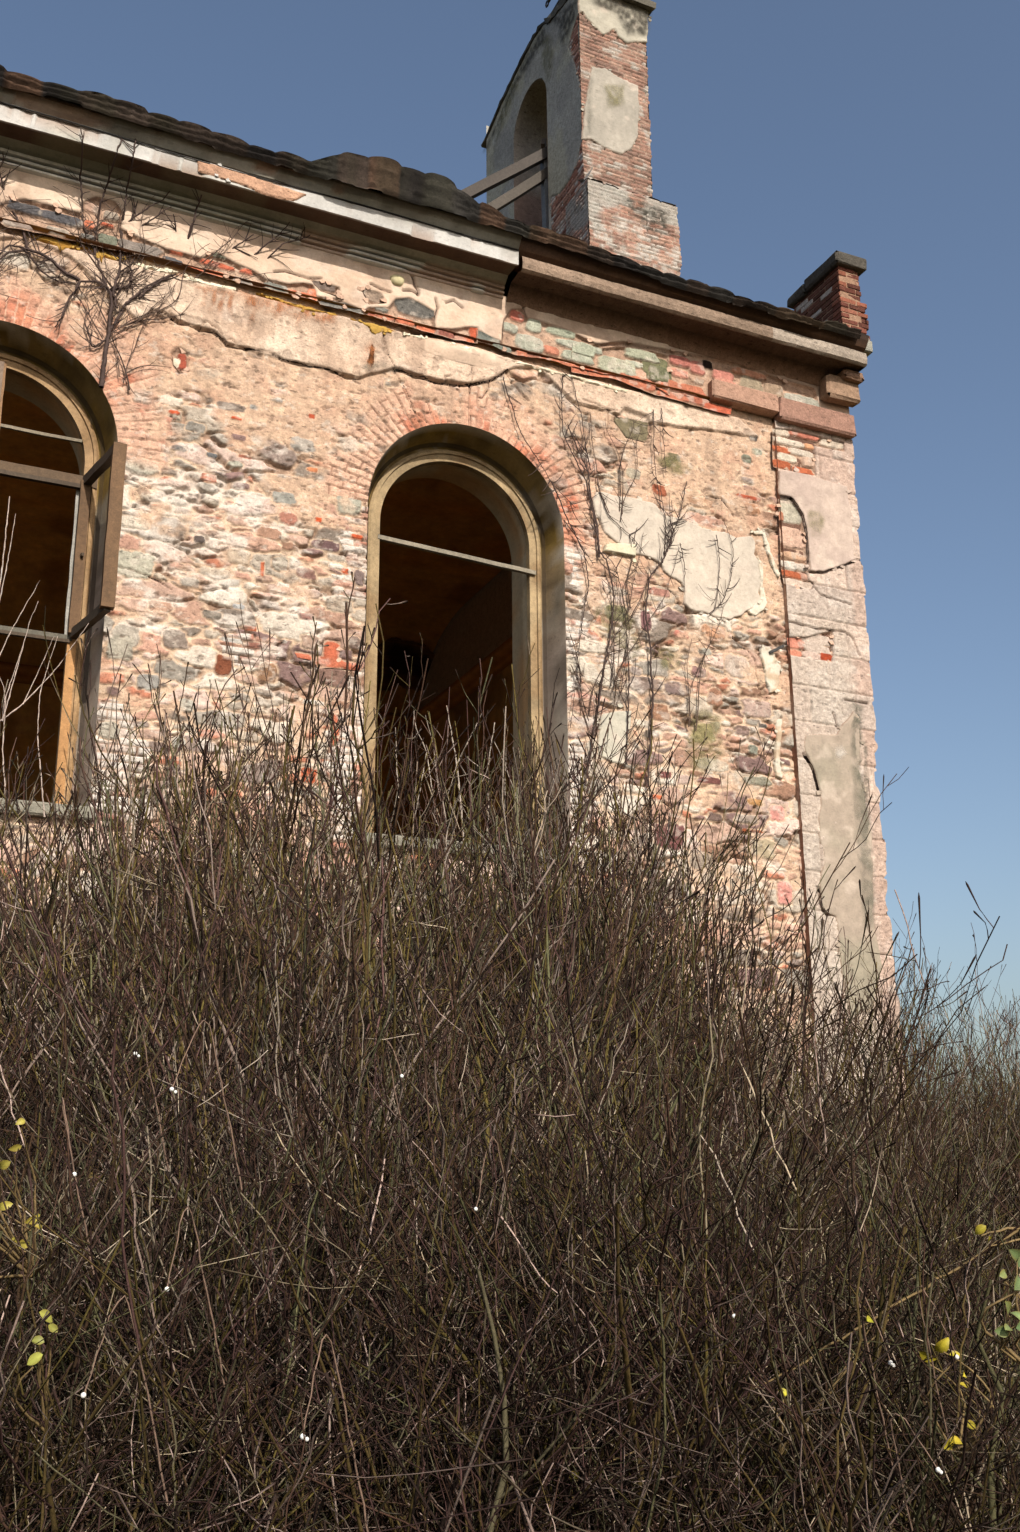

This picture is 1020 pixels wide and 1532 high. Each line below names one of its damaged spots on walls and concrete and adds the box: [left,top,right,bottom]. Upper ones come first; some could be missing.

flaking render [549,0,652,234]
spalling [197,161,306,201]
spalling [0,195,820,414]
crack [167,315,358,380]
crack [388,354,515,423]
spalling [614,411,652,442]
flaking render [592,429,856,622]
crack [780,495,851,636]
spalling [295,637,434,692]
spalling [759,631,834,693]
flaking render [597,703,632,766]